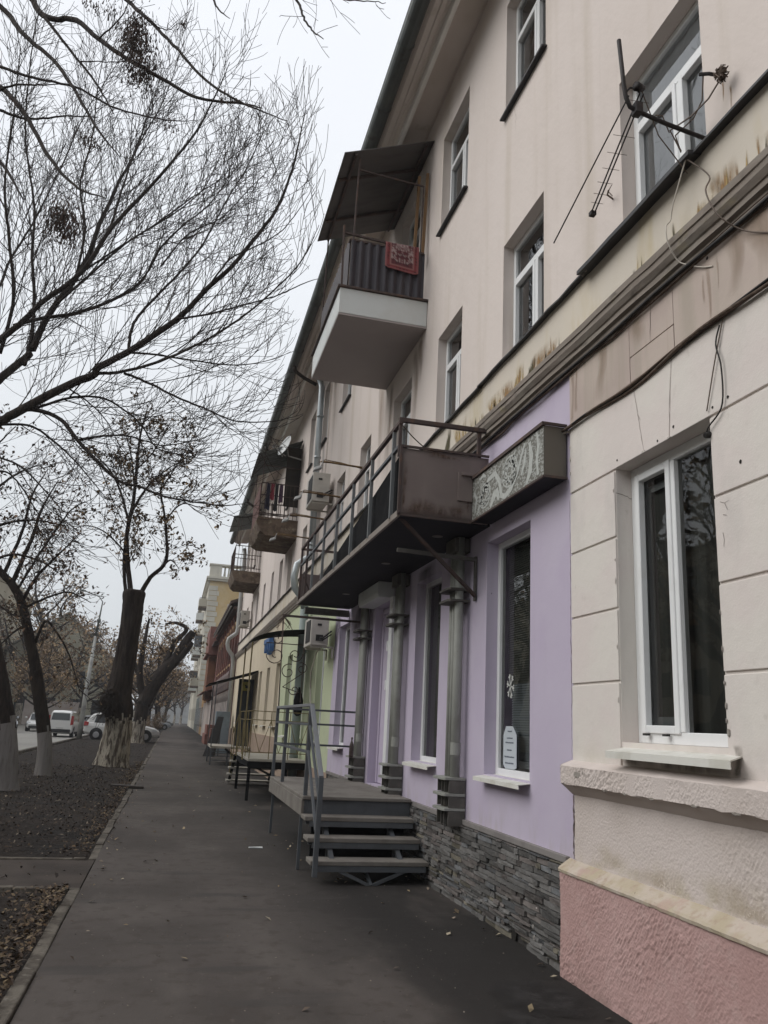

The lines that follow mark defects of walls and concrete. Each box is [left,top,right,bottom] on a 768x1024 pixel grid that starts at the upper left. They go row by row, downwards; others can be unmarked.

rust [490,342,554,411]